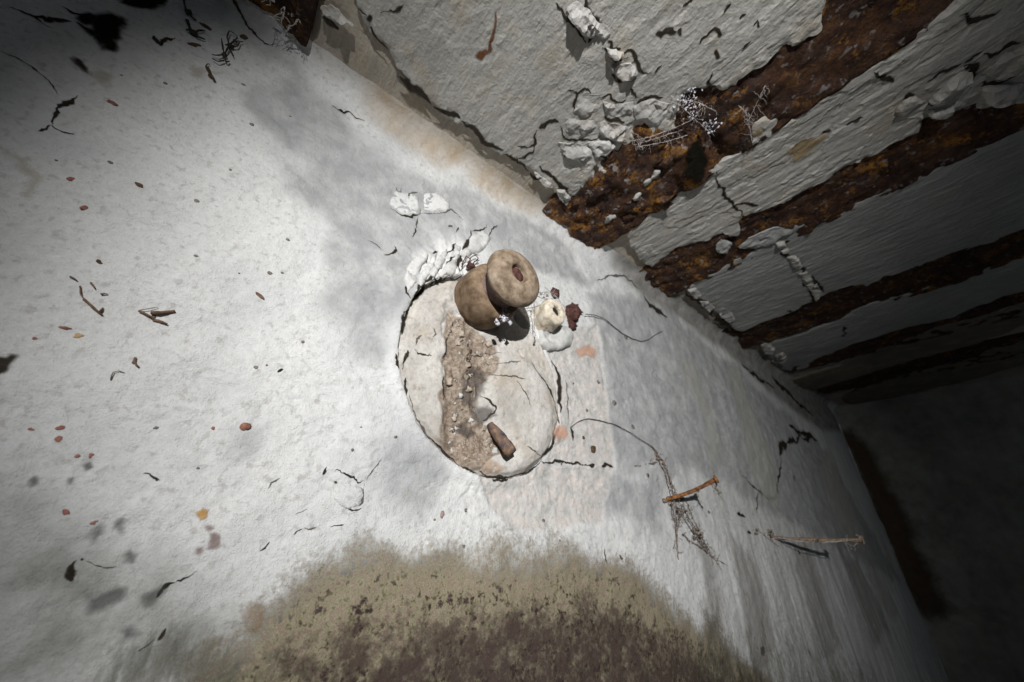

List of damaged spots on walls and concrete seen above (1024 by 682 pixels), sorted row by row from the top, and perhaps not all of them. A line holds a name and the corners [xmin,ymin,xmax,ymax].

corrosion [476,12,497,59]
spalling [566,1,638,82]
crack [6,53,78,134]
spalling [534,171,571,206]
spalling [559,91,671,162]
corrosion [685,139,709,184]
corrosion [788,136,825,161]
spalling [895,45,1024,120]
spalling [716,224,822,301]
crack [368,188,613,482]
crack [737,364,817,534]
damp [283,595,839,682]